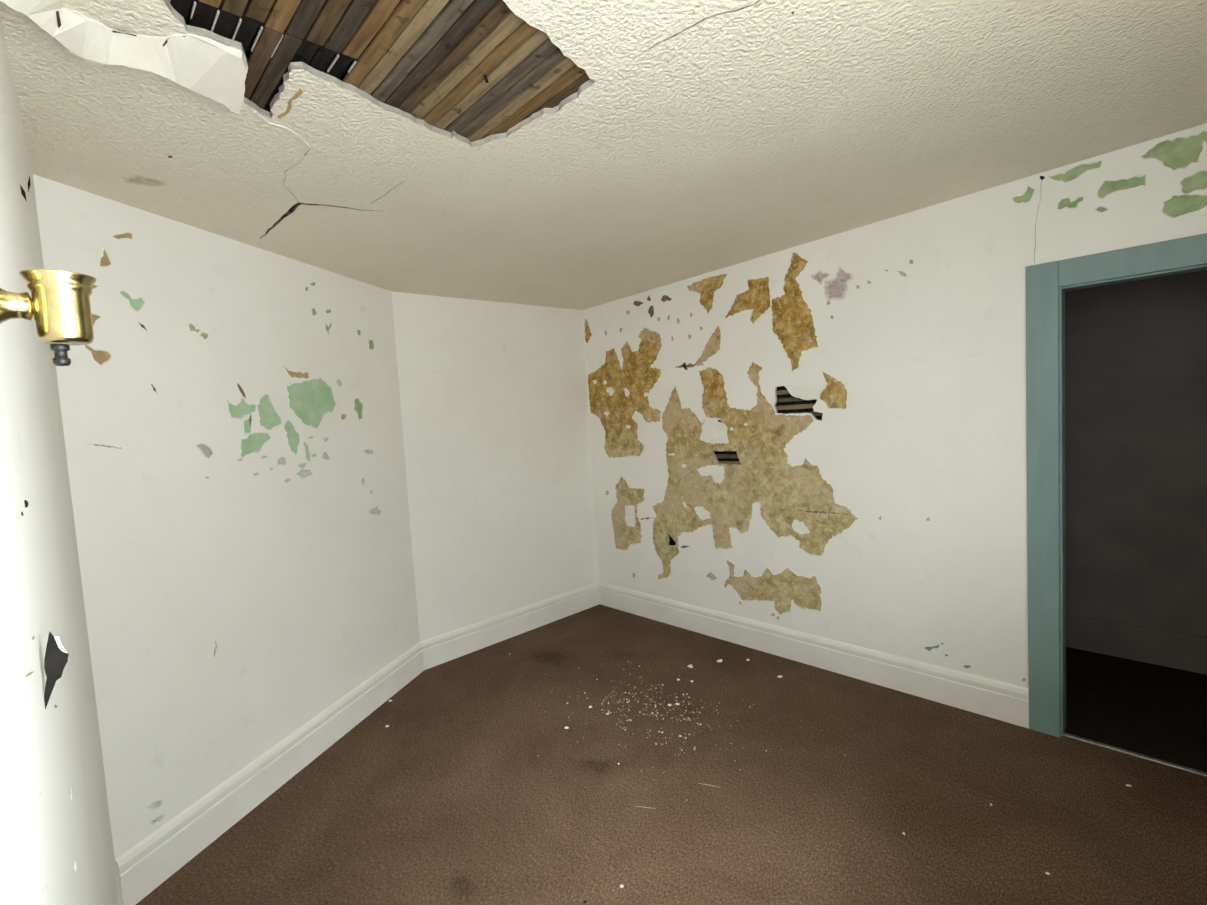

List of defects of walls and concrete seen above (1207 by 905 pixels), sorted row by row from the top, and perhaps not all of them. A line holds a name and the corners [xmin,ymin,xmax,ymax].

spalling [164,0,248,64]
crack [639,0,760,55]
spalling [244,62,596,147]
peeling [1012,130,1207,219]
peeling [227,366,363,482]
peeling [584,252,859,621]
hole [44,631,69,710]